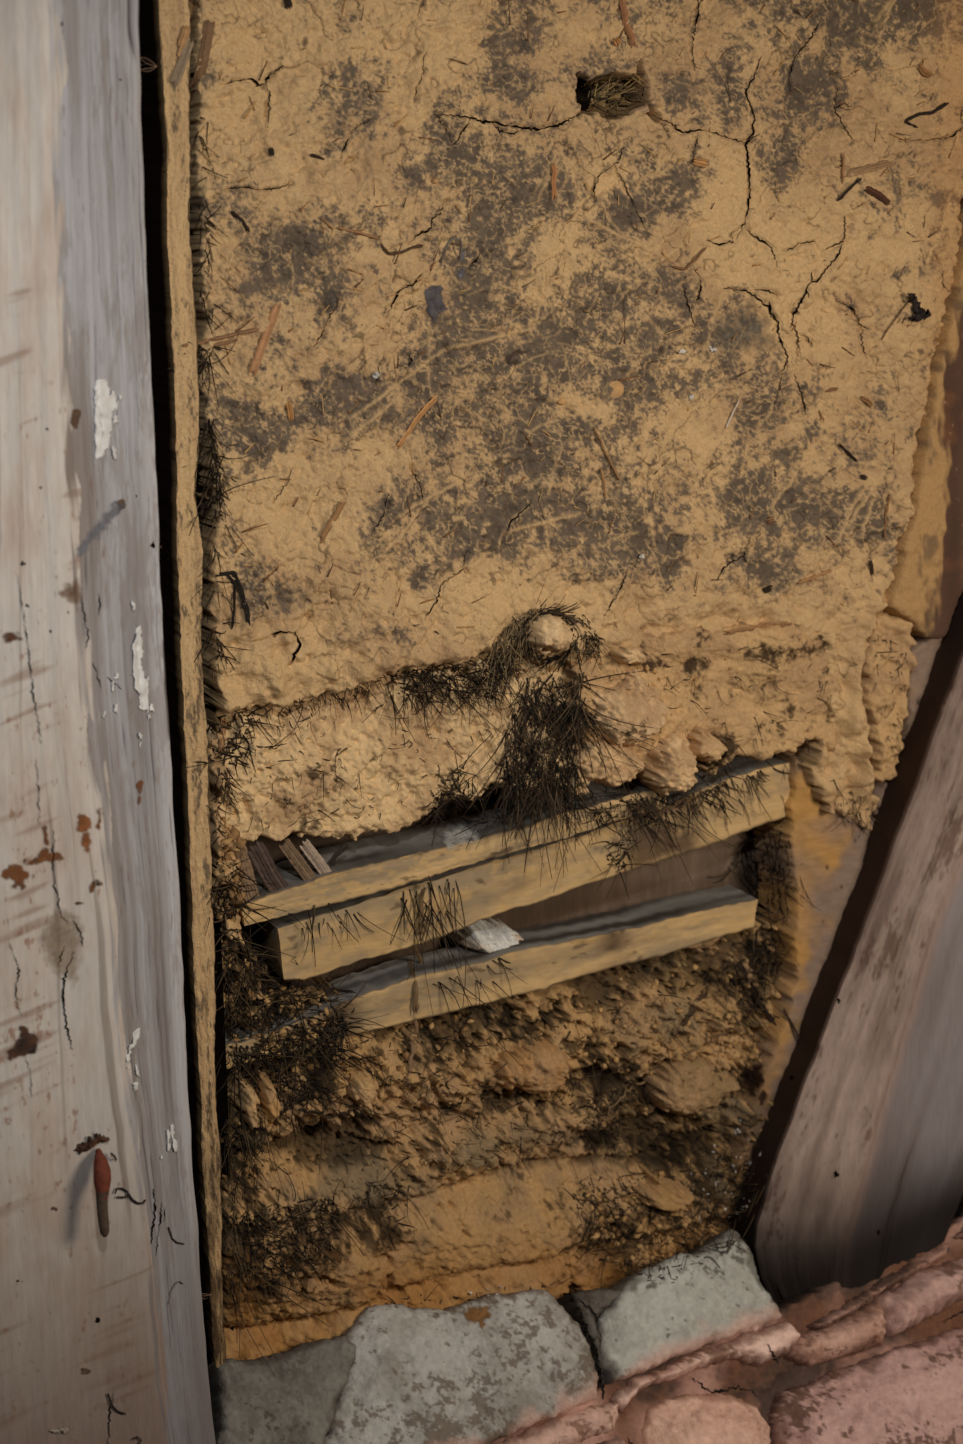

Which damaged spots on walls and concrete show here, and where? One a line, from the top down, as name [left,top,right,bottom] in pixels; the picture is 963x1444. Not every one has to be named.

crack [414,54,580,147]
crack [900,109,963,141]
crack [593,145,652,239]
crack [648,21,868,415]
peeling [94,379,123,460]
peeling [102,601,155,747]
corrosion [2,826,63,890]
corrosion [77,811,101,852]
spalling [204,621,842,1033]
corrosion [74,1133,110,1154]
spalling [219,913,782,1360]